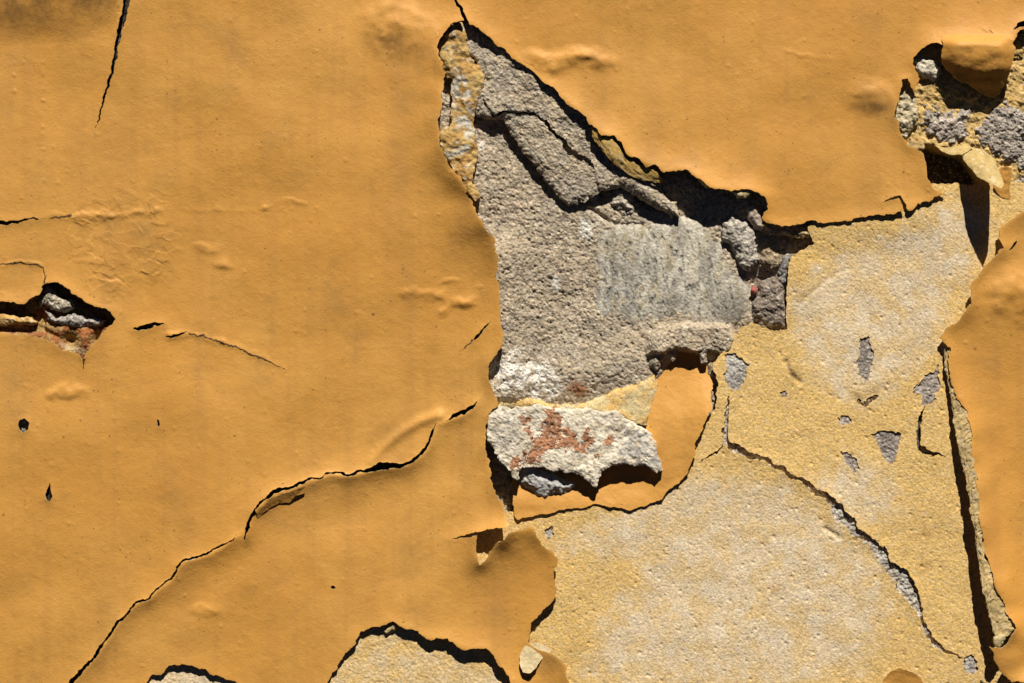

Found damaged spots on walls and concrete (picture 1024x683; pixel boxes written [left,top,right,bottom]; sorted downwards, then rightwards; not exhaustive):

crack [97,0,130,125]
crack [0,214,72,225]
spalling [0,282,115,359]
crack [133,322,286,370]
peeling [437,22,1024,683]
crack [69,400,478,683]
crack [701,396,962,658]
peeling [147,664,236,683]
peeling [328,621,510,683]